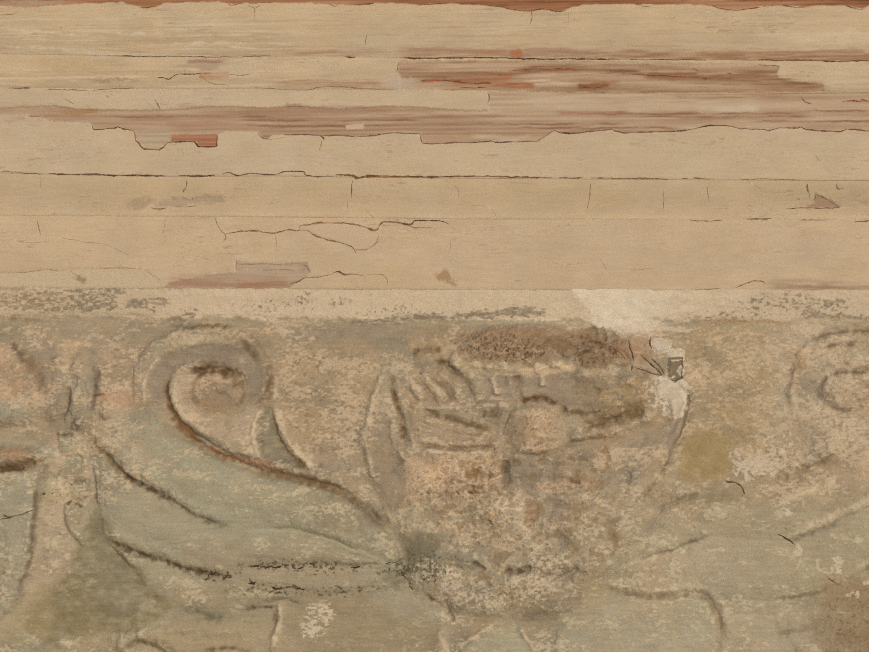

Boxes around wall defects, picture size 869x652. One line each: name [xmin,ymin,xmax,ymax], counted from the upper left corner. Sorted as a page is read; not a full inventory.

peeling [0,0,869,15]
peeling [0,38,869,151]
peeling [790,183,869,215]
peeling [214,217,449,253]
spalling [0,256,653,373]
damp [603,320,702,338]